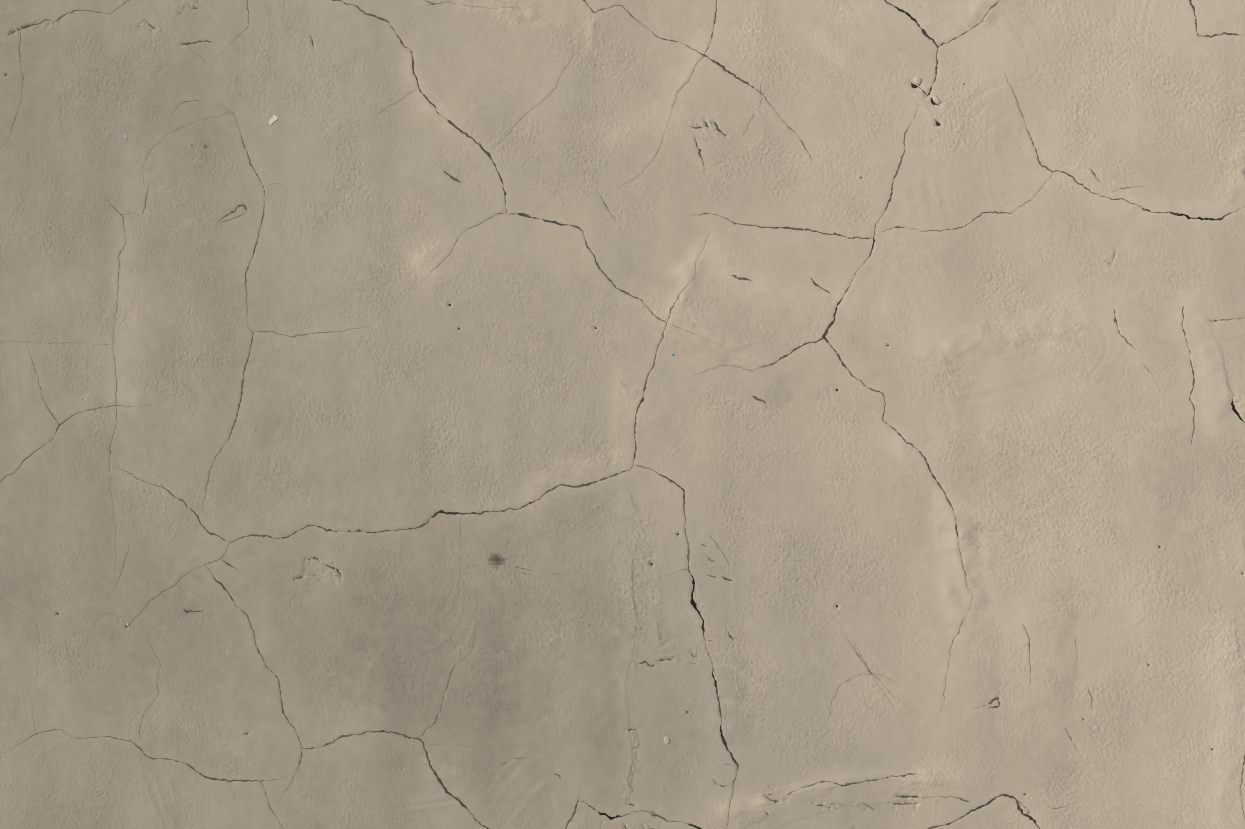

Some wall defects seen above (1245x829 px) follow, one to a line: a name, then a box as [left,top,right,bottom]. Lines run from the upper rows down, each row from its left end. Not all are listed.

crack [884,0,999,92]
crack [1189,0,1242,38]
crack [0,0,812,829]
crack [700,72,1245,713]
crack [785,773,1077,829]
crack [1237,755,1245,819]